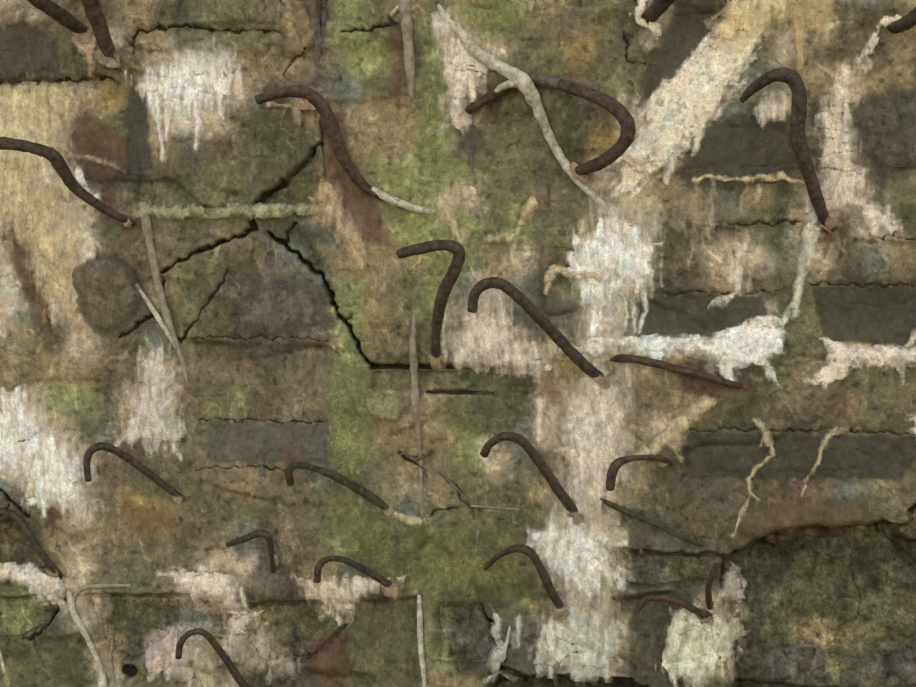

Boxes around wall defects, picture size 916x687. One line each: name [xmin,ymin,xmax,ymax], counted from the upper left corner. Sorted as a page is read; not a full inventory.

crack [132,0,282,55]
crack [341,17,397,33]
leakage [0,0,140,339]
corrosion [75,119,124,200]
leakage [128,61,366,269]
corrosion [323,113,389,243]
crack [161,120,530,395]
crack [0,488,30,517]
leakage [0,385,94,520]
crack [119,314,155,338]
leakage [114,347,185,461]
leakage [433,0,916,687]